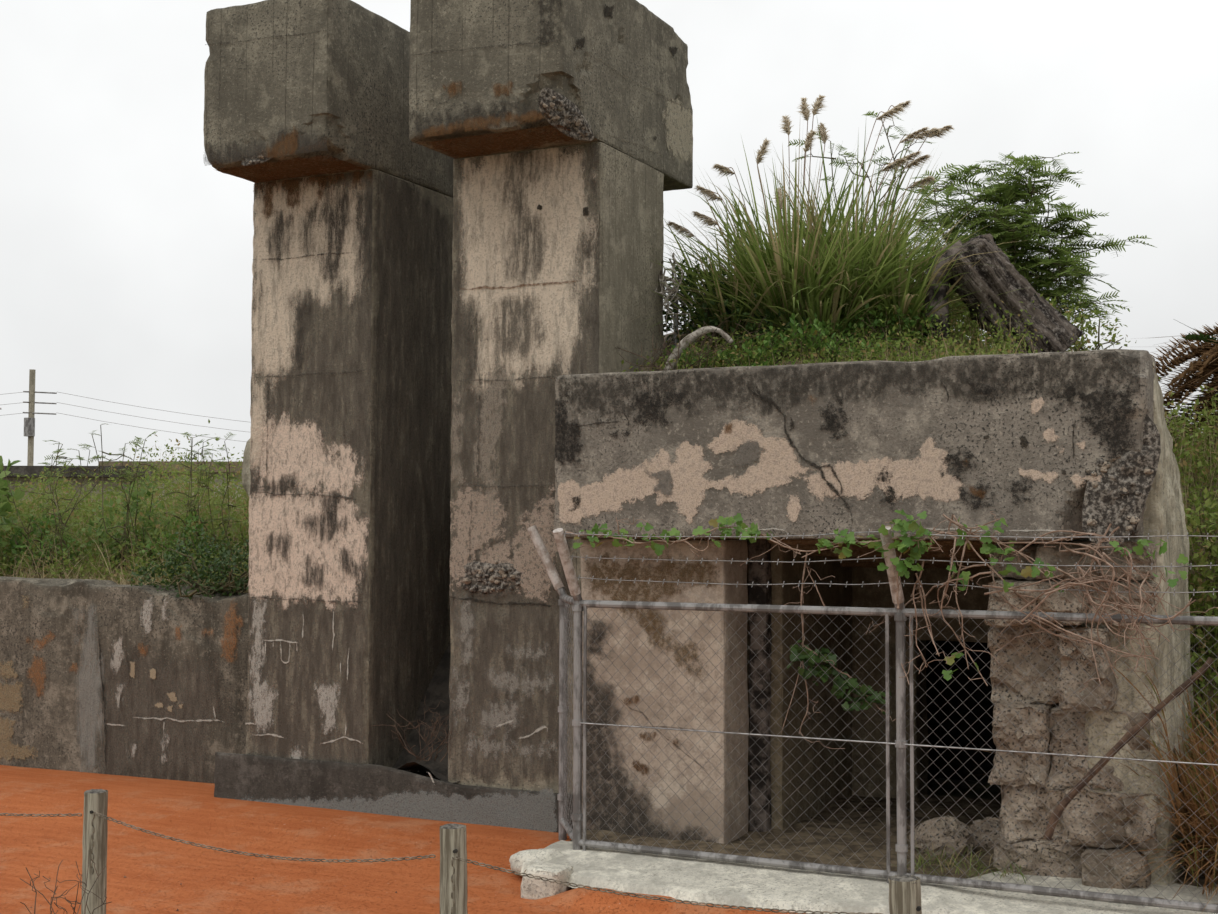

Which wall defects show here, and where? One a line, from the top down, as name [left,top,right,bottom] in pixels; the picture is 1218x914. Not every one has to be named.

leakage [203,130,328,165]
rust [216,154,372,216]
rust [422,110,574,157]
peeling [248,177,368,609]
leakage [241,143,1140,843]
peeling [450,88,968,602]
crack [748,383,853,525]
peeling [1031,397,1044,414]
spalling [1019,414,1161,550]
leakage [140,597,167,633]
leakage [75,607,232,783]